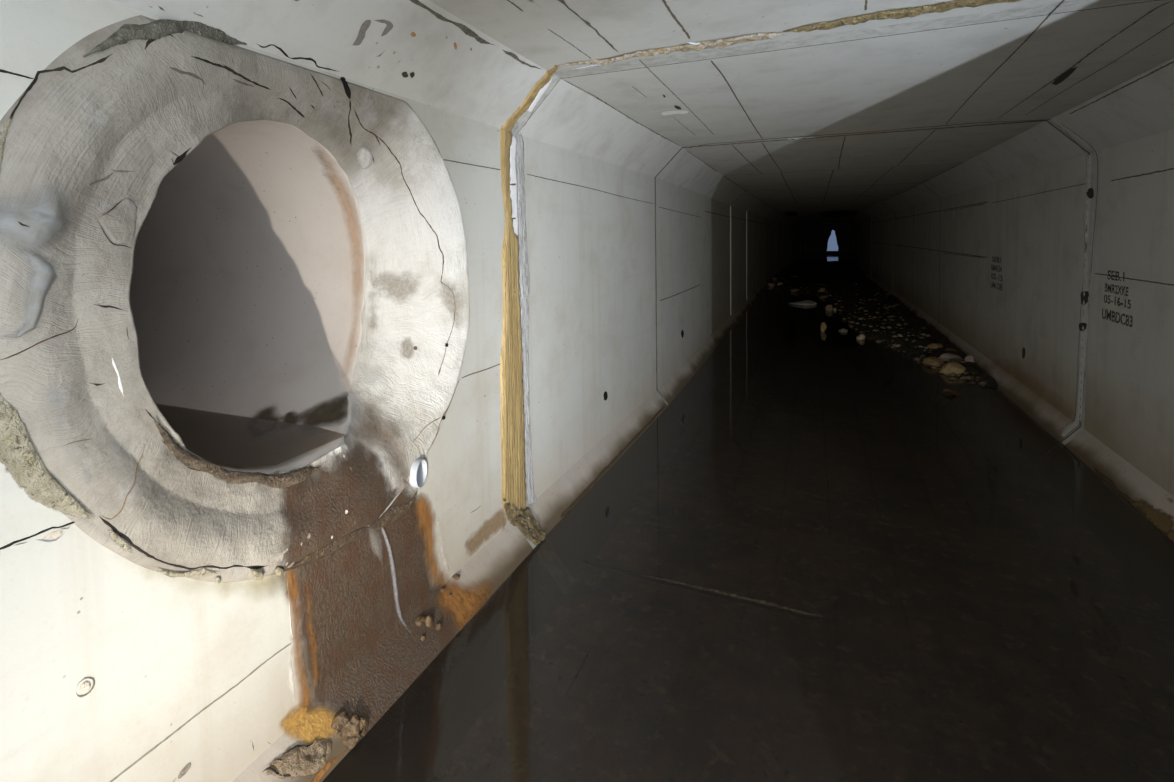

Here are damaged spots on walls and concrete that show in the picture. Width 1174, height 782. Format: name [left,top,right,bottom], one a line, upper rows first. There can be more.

crack [0,54,112,119]
crack [145,34,340,118]
spalling [334,77,352,144]
crack [91,169,133,184]
peeling [97,198,137,248]
crack [354,110,459,446]
crack [1,305,129,360]
spalling [153,418,322,488]
corrosion [281,490,487,757]
corrosion [312,757,339,782]